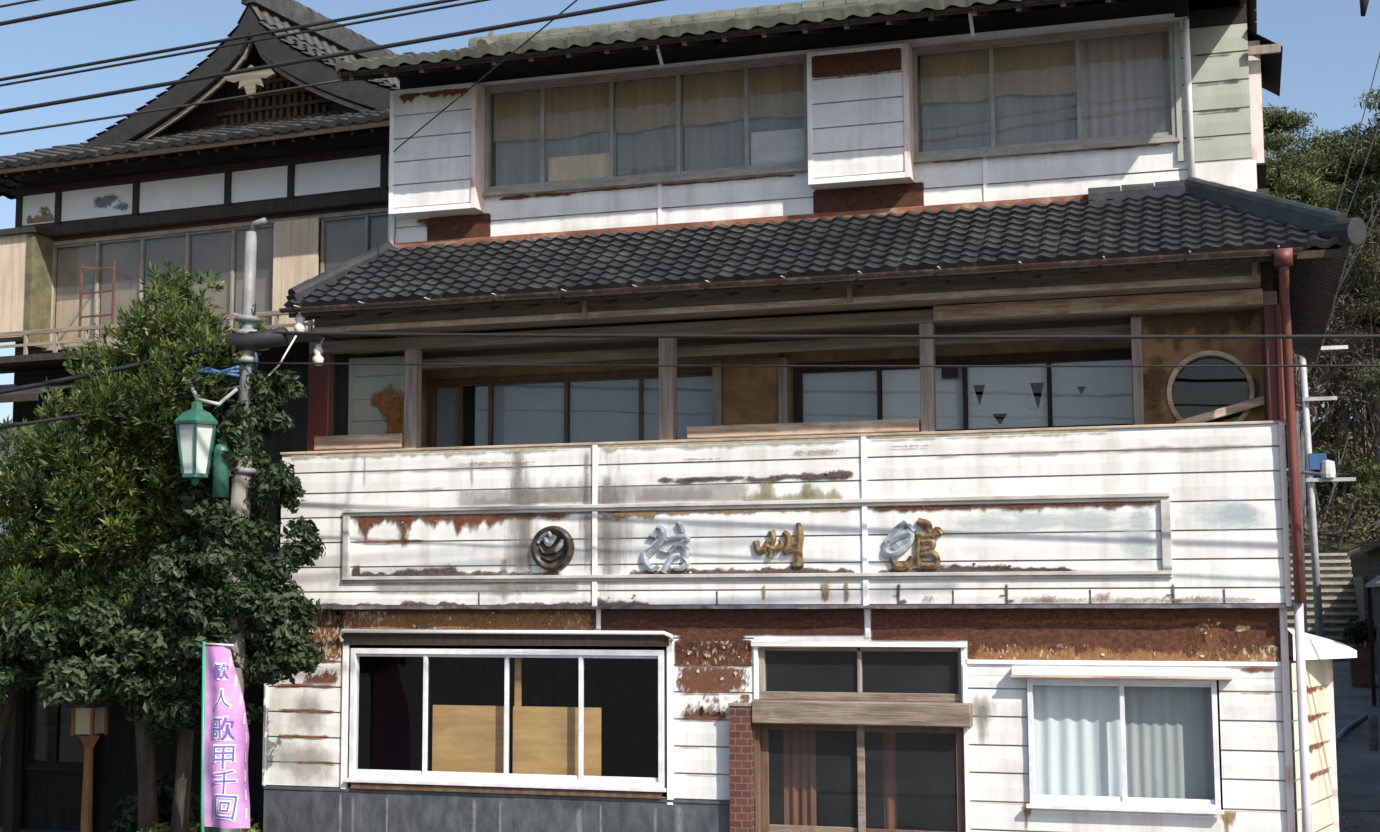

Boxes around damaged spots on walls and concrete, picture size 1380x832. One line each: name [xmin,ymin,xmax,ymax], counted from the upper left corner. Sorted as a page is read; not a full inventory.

rust [355,513,567,545]
rust [336,593,1281,721]
rust [277,659,338,688]